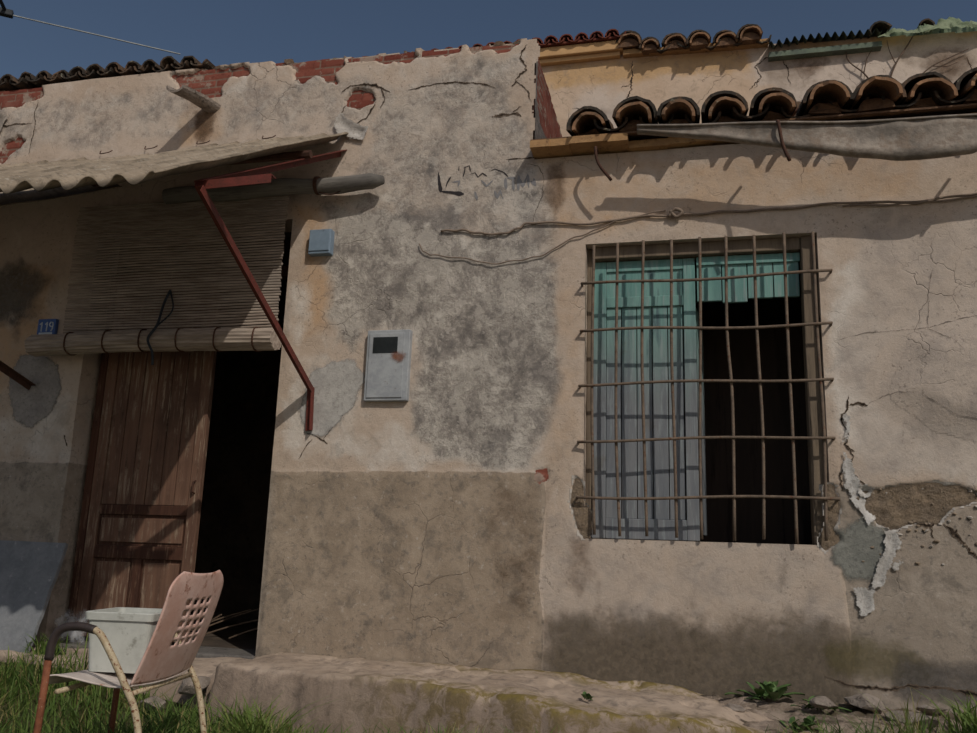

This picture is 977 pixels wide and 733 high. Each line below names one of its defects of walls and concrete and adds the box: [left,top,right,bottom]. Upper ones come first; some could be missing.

flaking render [0,87,44,110]
flaking render [334,87,376,140]
flaking render [273,43,520,85]
crack [341,45,530,124]
crack [749,57,791,90]
leakage [0,260,45,321]
crack [840,270,977,348]
flaking render [9,354,62,428]
flaking render [300,359,365,436]
crack [839,391,977,491]
flaking render [817,413,977,616]
leakage [540,617,854,703]